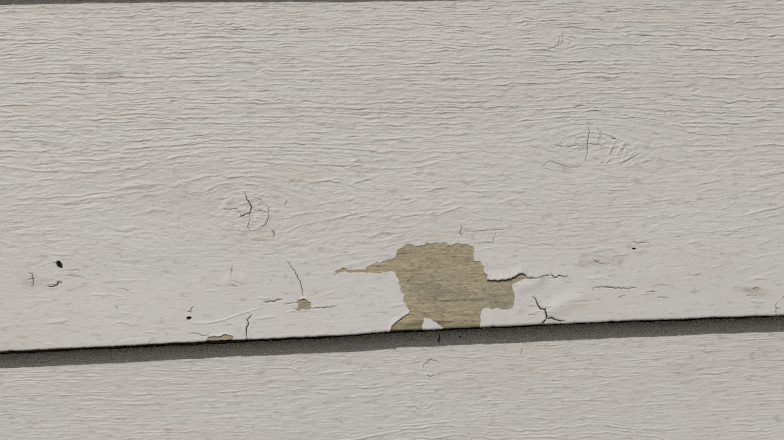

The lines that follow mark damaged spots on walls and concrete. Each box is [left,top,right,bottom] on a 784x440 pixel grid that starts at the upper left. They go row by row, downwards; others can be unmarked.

crack [225,193,288,237]
peeling [295,295,312,311]
peeling [336,243,552,332]
crack [529,297,563,324]